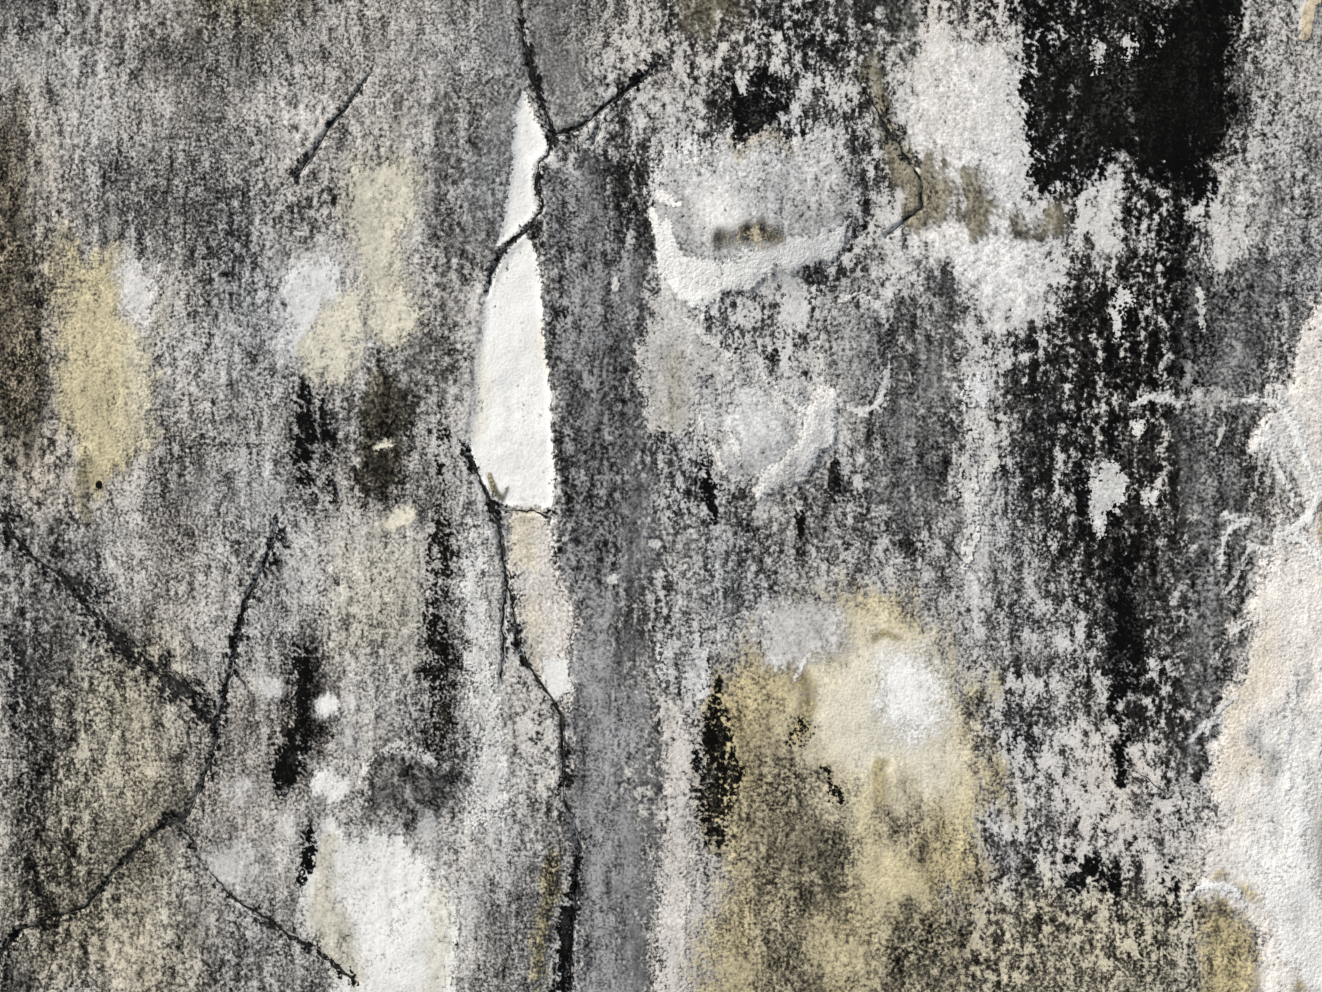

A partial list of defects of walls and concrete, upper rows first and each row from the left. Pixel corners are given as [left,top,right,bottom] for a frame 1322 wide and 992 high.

crack [289,80,365,183]
crack [480,0,667,303]
crack [0,476,359,988]
spalling [456,90,579,841]
crack [457,439,584,992]
leakage [746,596,855,682]
leakage [794,509,812,540]
leakage [827,459,842,503]
leakage [854,0,1322,992]